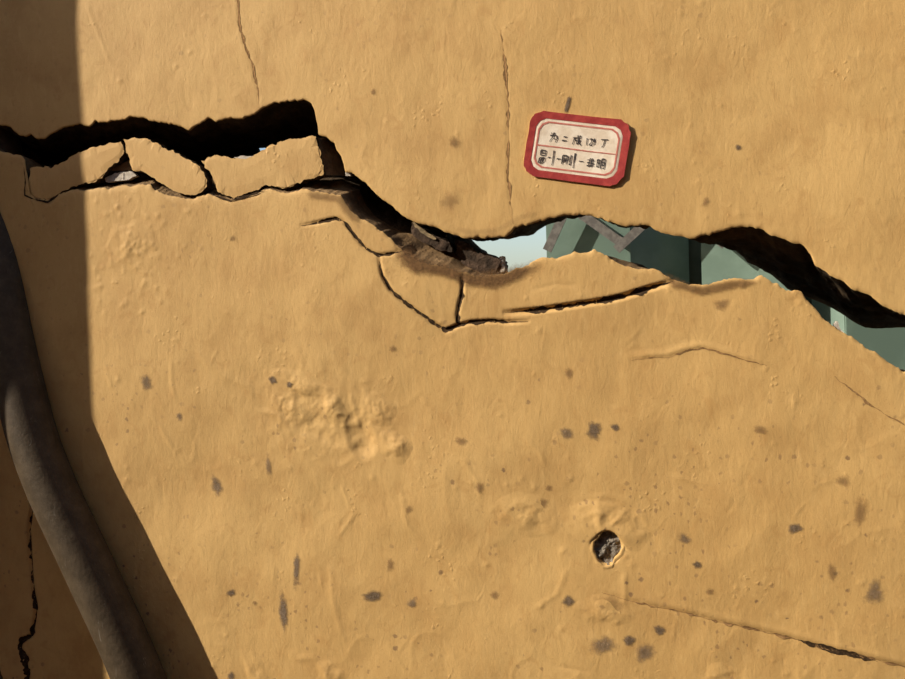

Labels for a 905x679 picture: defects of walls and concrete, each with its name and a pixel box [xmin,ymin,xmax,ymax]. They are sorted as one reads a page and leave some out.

crack [0,0,670,333]
crack [692,227,905,333]
crack [18,506,38,679]
spalling [590,531,625,570]
crack [603,593,905,667]